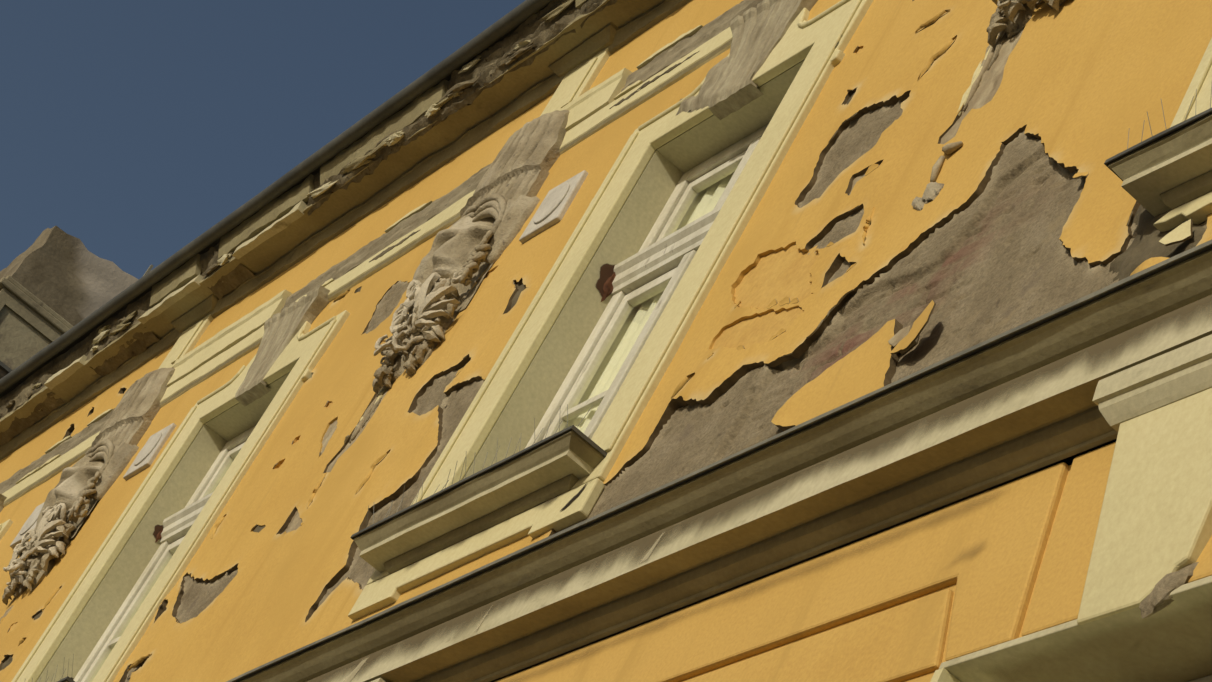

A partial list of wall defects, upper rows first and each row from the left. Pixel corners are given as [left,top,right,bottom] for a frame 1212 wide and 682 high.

spalling [307,0,617,216]
spalling [609,0,763,115]
flaking render [798,89,903,254]
spalling [280,163,492,313]
spalling [89,301,160,377]
flaking render [365,281,409,333]
flaking render [556,130,1207,533]
spalling [0,366,64,447]
spalling [0,406,115,494]
flaking render [366,355,484,528]
flaking render [158,568,238,623]
spalling [1139,562,1199,619]